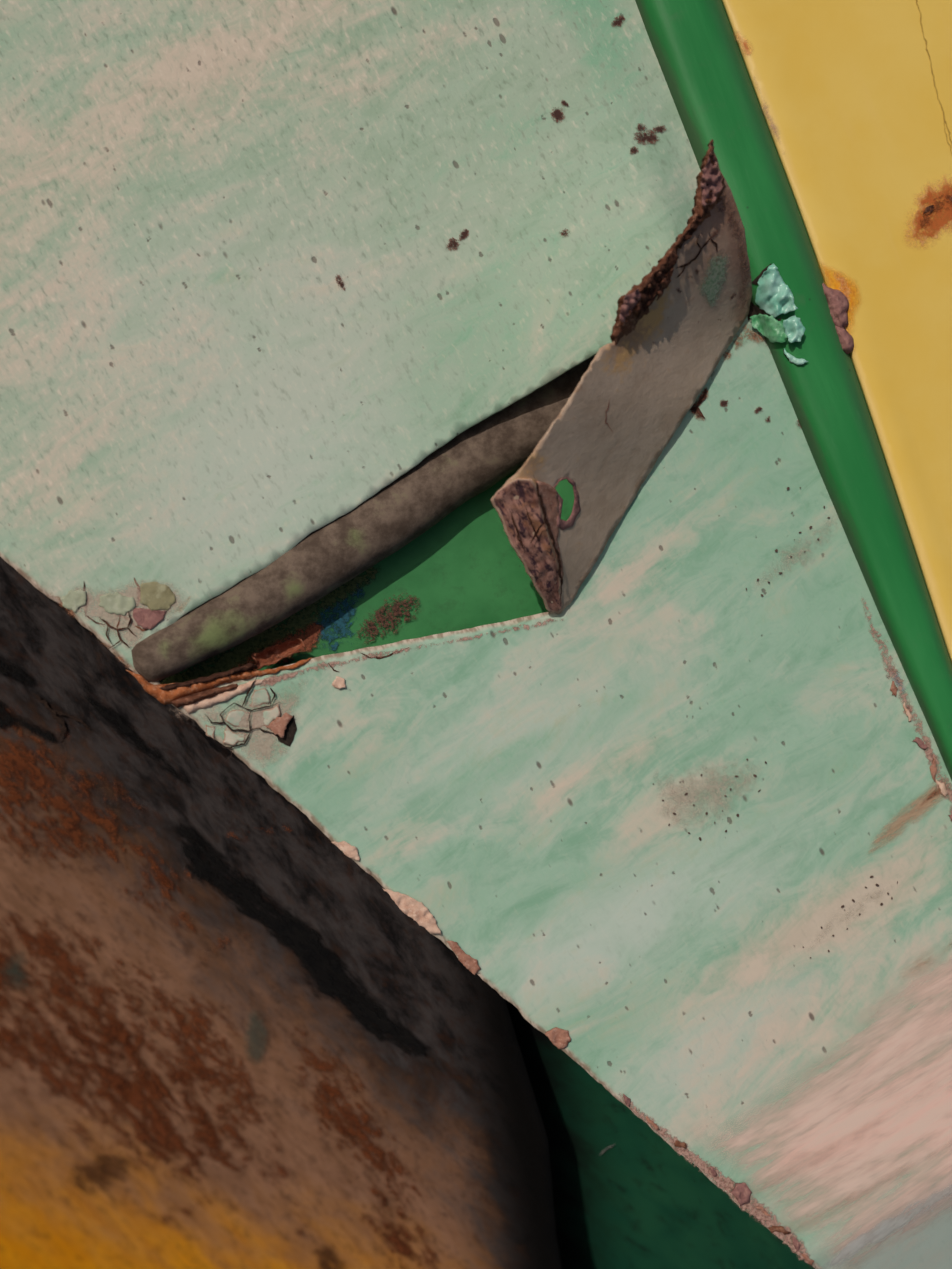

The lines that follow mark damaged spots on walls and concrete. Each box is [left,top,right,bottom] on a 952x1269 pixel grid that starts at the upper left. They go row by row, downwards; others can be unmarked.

peeling [619,152,723,325]
corrosion [908,179,952,246]
corrosion [822,267,859,354]
peeling [60,582,177,642]
peeling [0,701,56,742]
peeling [159,638,306,759]
corrosion [865,602,952,843]
peeling [174,823,430,1056]
peeling [383,889,481,975]
corrosion [0,916,265,1222]
peeling [545,1027,571,1049]
peeling [731,1182,752,1206]